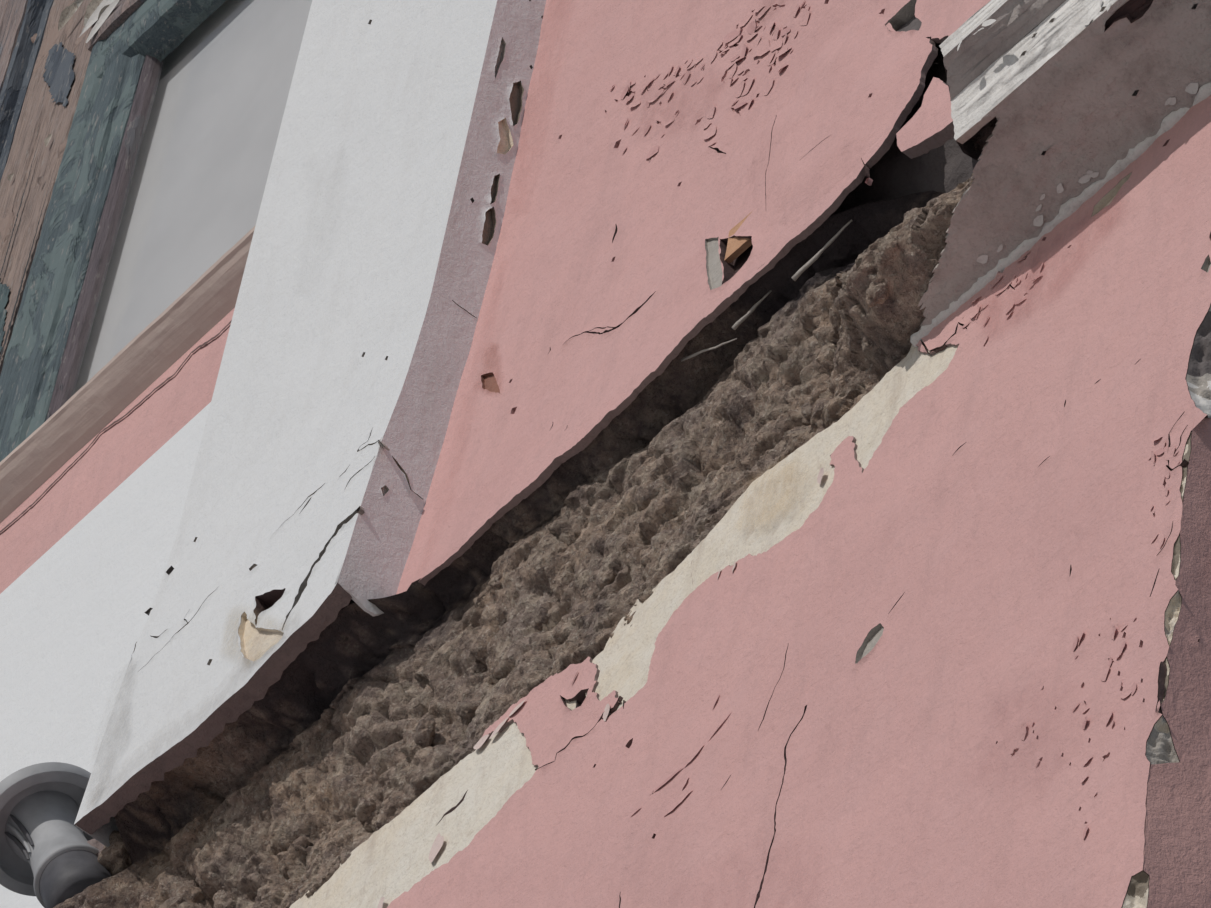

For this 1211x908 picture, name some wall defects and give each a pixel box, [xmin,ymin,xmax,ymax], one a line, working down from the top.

spalling [495,37,506,79]
peeling [605,2,810,162]
spalling [1084,0,1153,32]
crack [571,291,656,338]
spalling [1186,306,1211,418]
crack [282,428,422,630]
flaking render [53,56,978,908]
peeling [1148,432,1192,517]
crack [759,643,789,728]
spalling [1146,534,1181,764]
crack [754,705,807,908]
spalling [1122,871,1149,908]